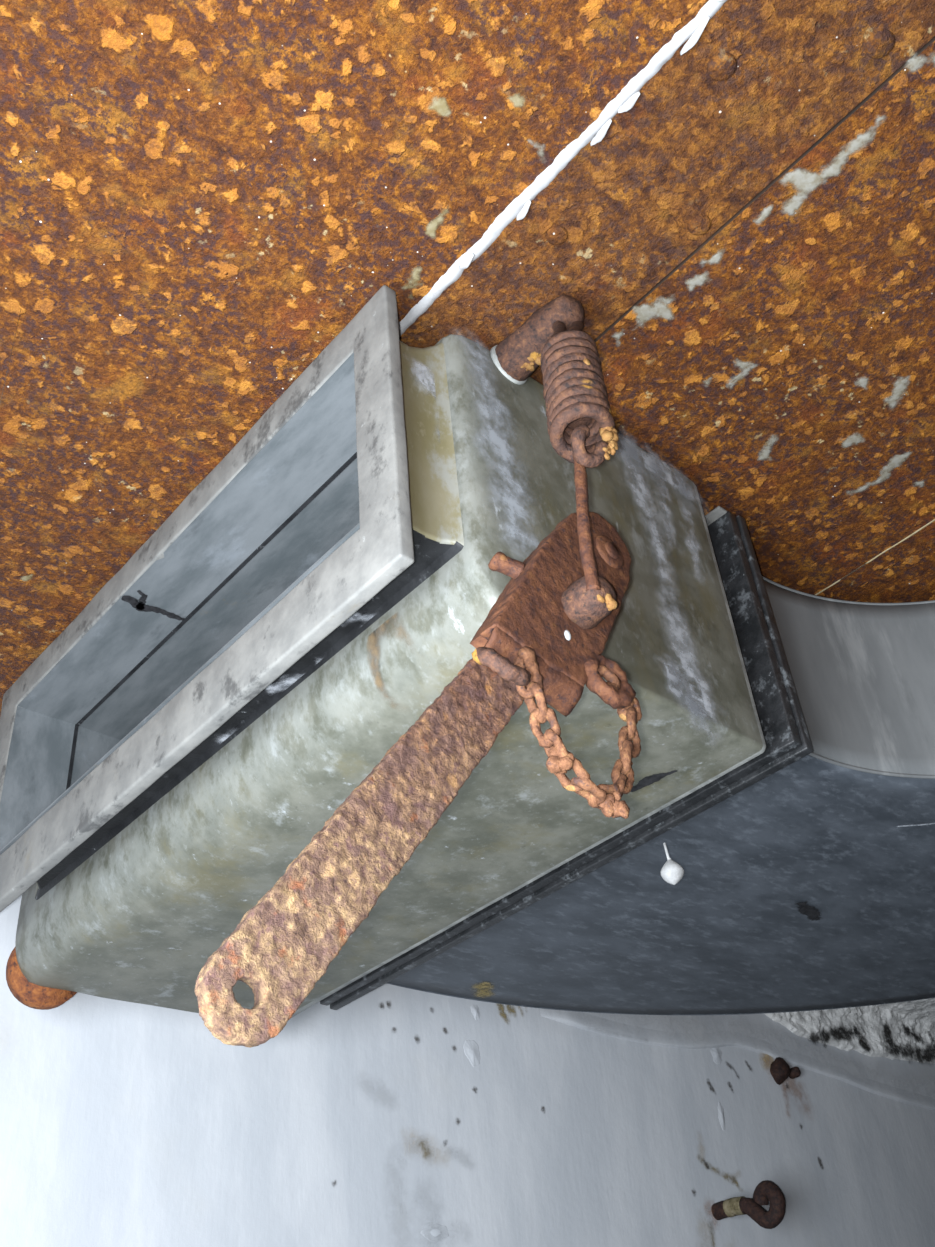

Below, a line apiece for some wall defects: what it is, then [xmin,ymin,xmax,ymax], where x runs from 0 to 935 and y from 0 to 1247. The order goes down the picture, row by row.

peeling [680,15,710,55]
peeling [907,56,935,71]
peeling [755,116,884,223]
peeling [686,252,722,291]
peeling [633,298,673,325]
peeling [728,361,756,387]
peeling [885,377,909,408]
corrosion [569,418,592,429]
peeling [759,436,777,460]
peeling [842,434,863,447]
peeling [847,452,911,493]
corrosion [368,620,388,688]